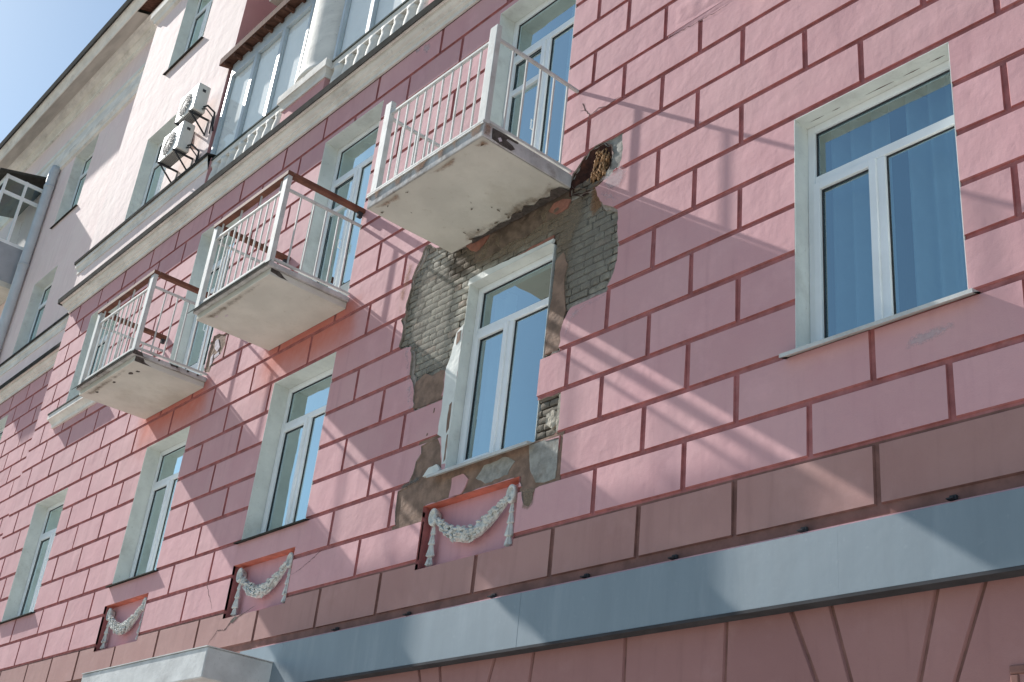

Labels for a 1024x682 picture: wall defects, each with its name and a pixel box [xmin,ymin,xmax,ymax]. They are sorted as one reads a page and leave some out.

spalling [392,178,619,530]
crack [207,583,251,642]